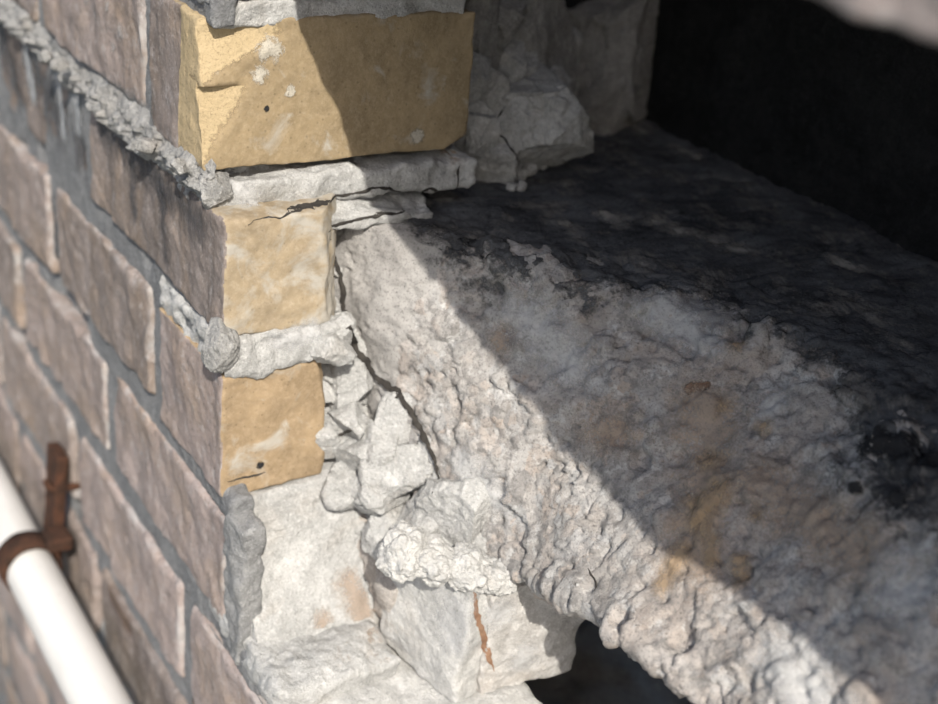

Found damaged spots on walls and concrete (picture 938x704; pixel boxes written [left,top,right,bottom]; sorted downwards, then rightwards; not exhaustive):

crack [248,166,460,494]
spalling [357,239,938,704]
damp [406,119,938,578]
damp [758,631,850,704]